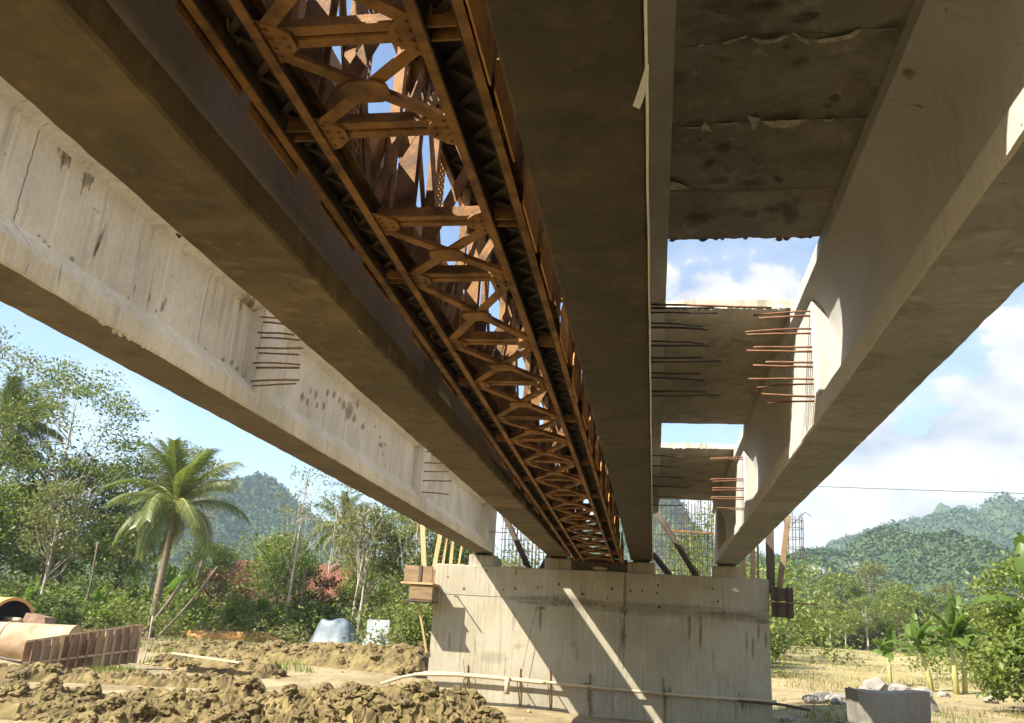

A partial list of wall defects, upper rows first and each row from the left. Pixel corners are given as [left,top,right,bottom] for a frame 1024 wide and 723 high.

peeling [722,29,861,44]
peeling [676,115,807,132]
crack [14,123,51,273]